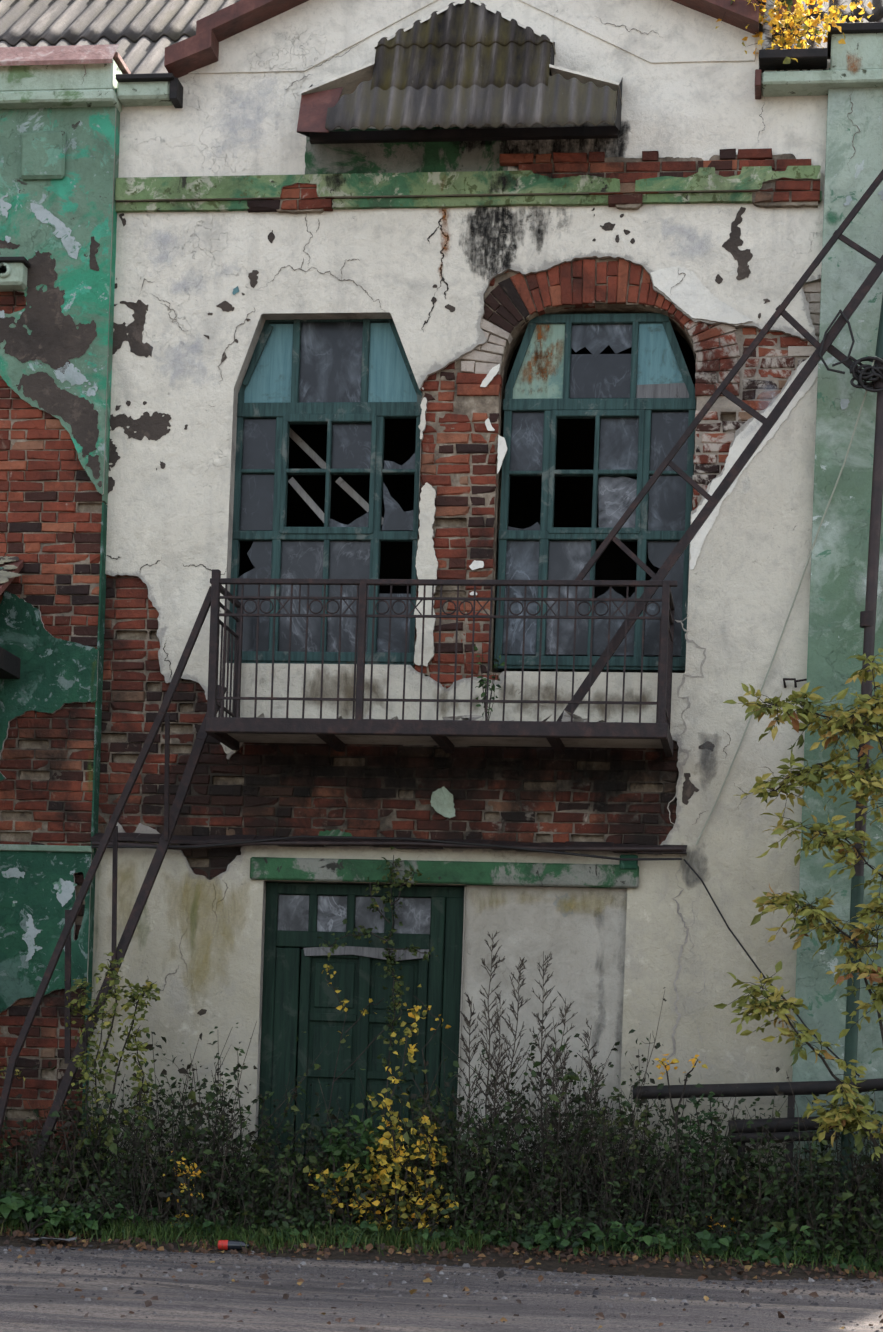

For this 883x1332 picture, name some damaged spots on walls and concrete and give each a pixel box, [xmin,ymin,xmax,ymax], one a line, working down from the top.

flaking render [247,183,335,214]
damp [325,174,346,189]
damp [442,122,630,277]
crack [139,279,188,331]
crack [208,213,393,407]
crack [422,208,449,330]
flaking render [413,148,821,689]
flaking render [0,194,699,880]
peeling [12,901,42,961]
peeling [53,878,77,907]